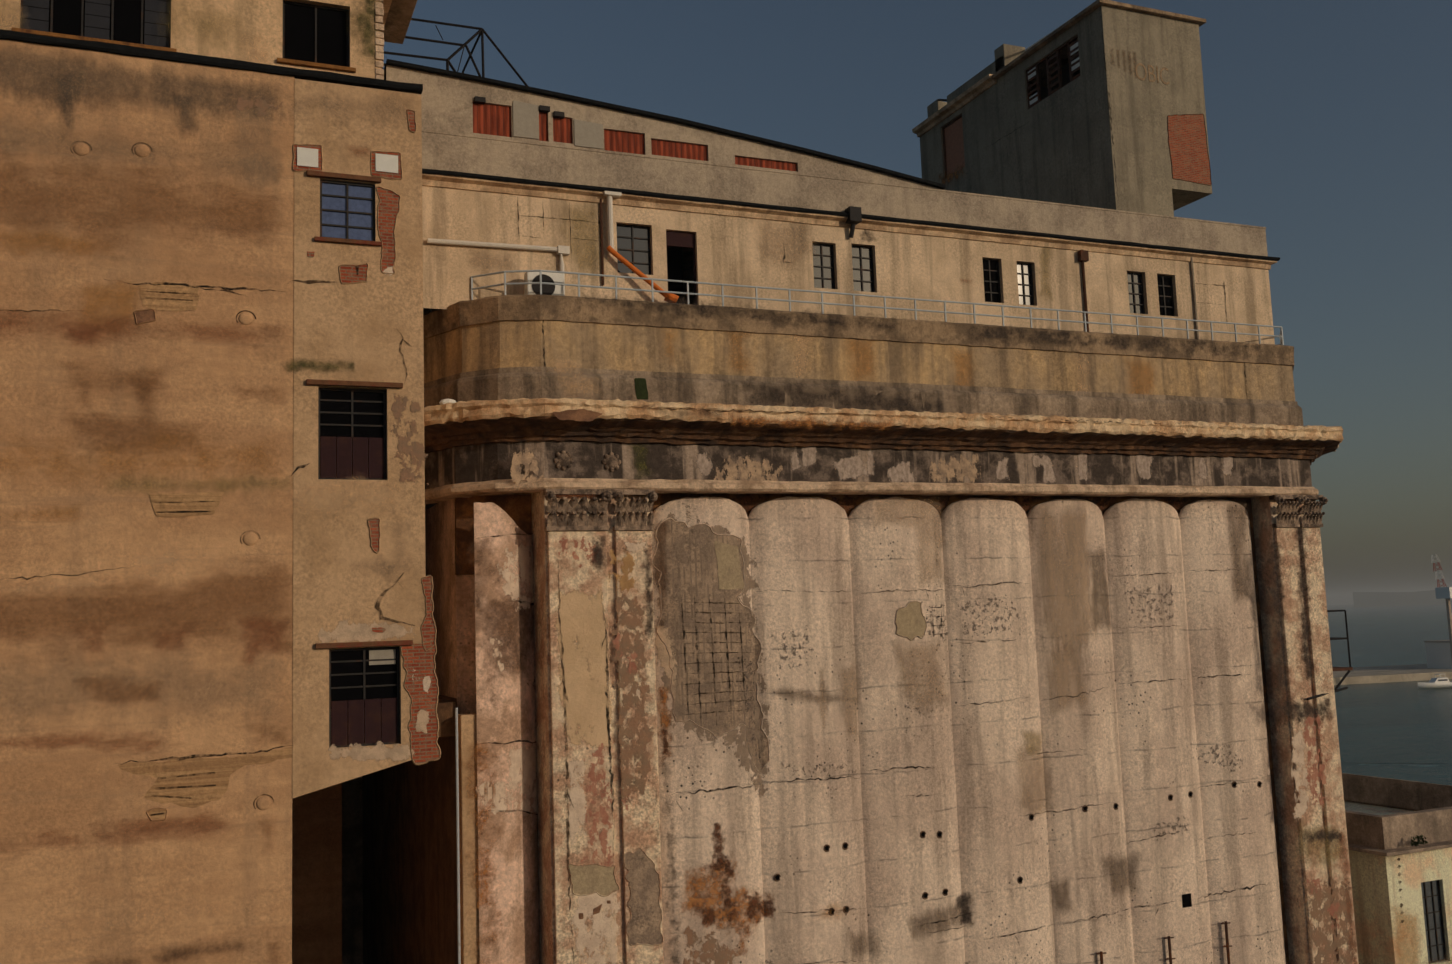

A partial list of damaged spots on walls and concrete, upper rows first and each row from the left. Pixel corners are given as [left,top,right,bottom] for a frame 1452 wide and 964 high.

leakage [0,53,273,128]
spalling [338,151,403,285]
crack [104,279,334,295]
peeling [508,447,544,489]
peeling [714,454,783,481]
peeling [929,454,982,483]
crack [15,569,113,580]
crack [375,573,415,626]
spalling [318,575,441,765]
spalling [555,506,856,964]
spalling [118,747,292,822]
corrosion [683,823,776,955]